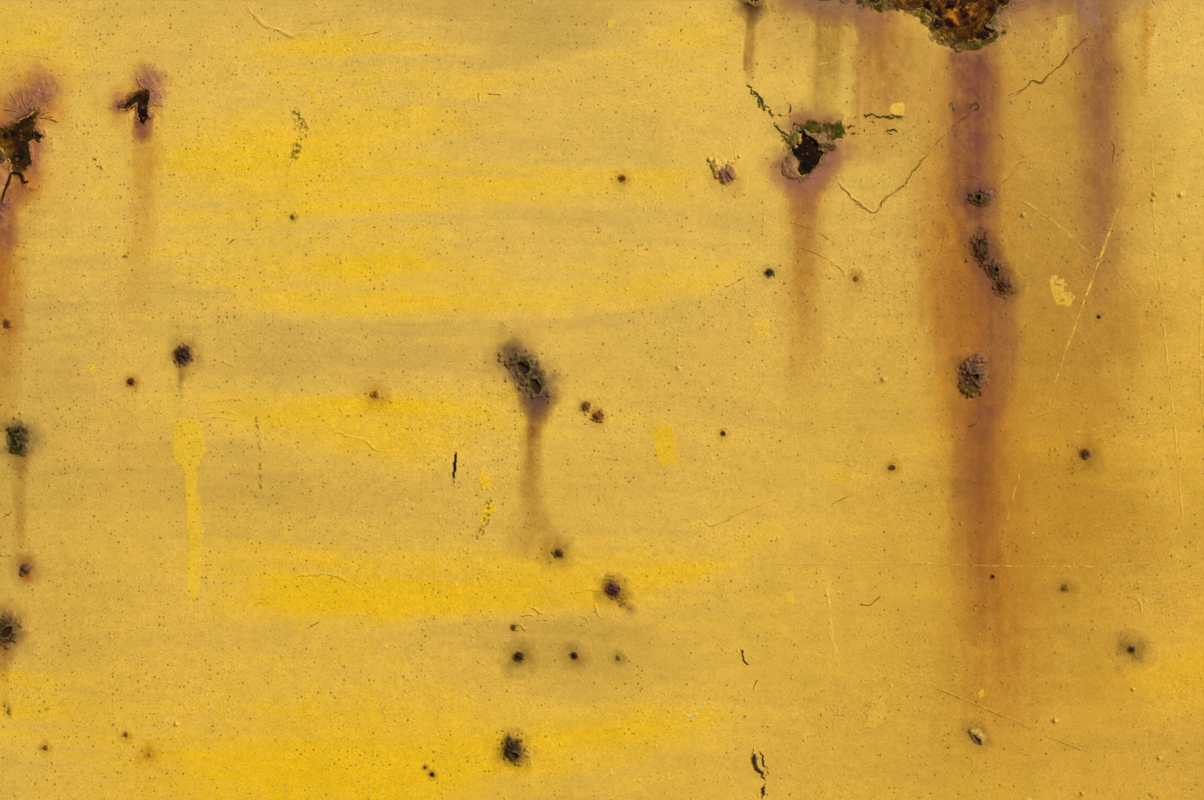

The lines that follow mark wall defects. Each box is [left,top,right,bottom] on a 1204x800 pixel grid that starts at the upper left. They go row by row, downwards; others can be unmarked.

corrosion [114,111,169,333]
peeling [712,0,1075,77]
crack [839,36,1091,213]
corrosion [0,190,55,722]
corrosion [480,321,612,577]
corrosion [756,0,1162,779]
corrosion [592,568,641,620]
corrosion [487,719,543,778]